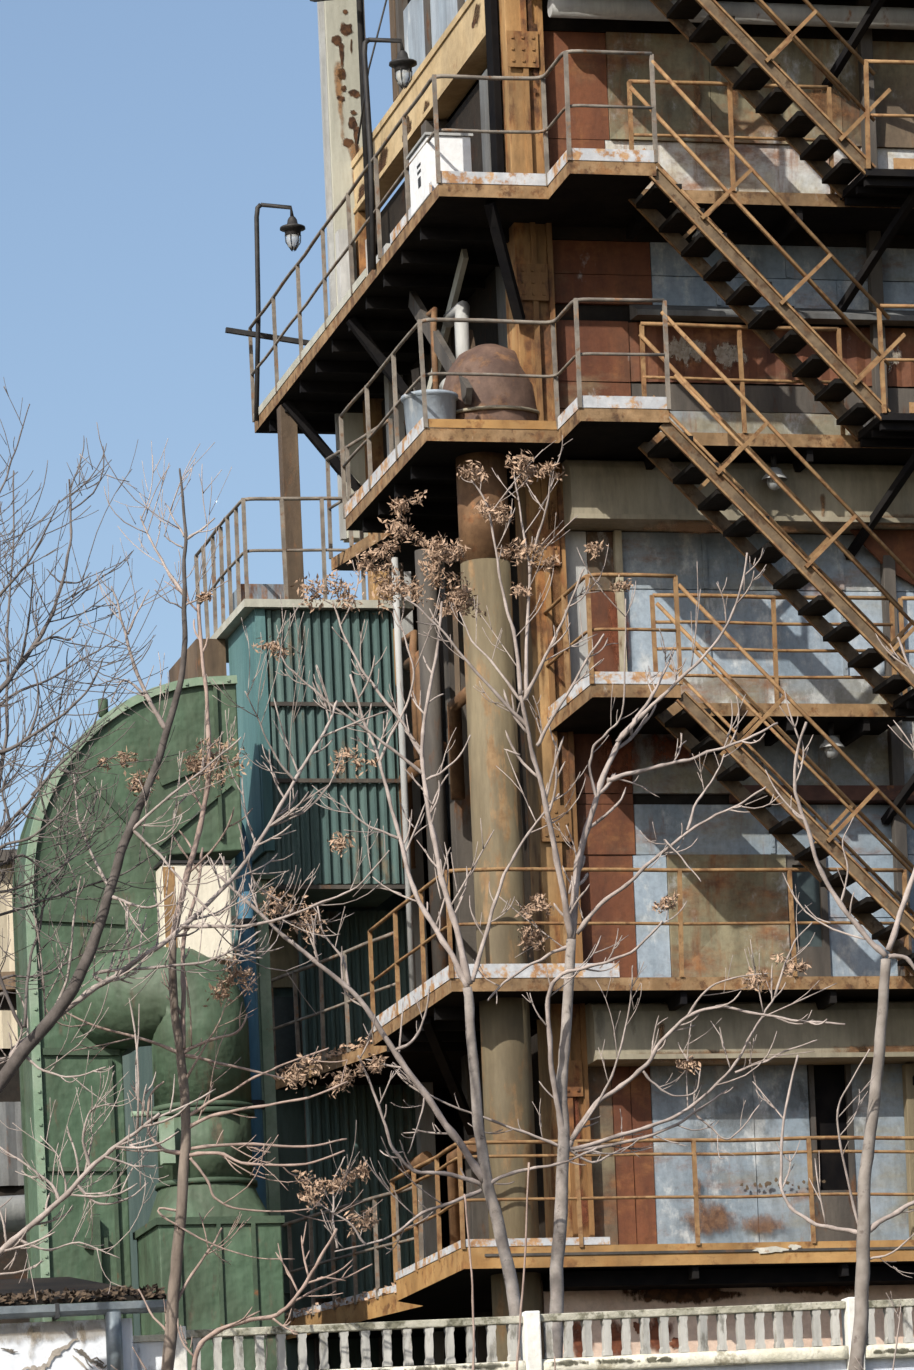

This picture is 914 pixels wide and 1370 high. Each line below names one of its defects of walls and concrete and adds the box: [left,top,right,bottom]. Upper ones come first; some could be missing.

rust [331,9,364,203]
rust [378,149,388,178]
rust [685,1179,782,1233]
crack [1,1338,107,1370]